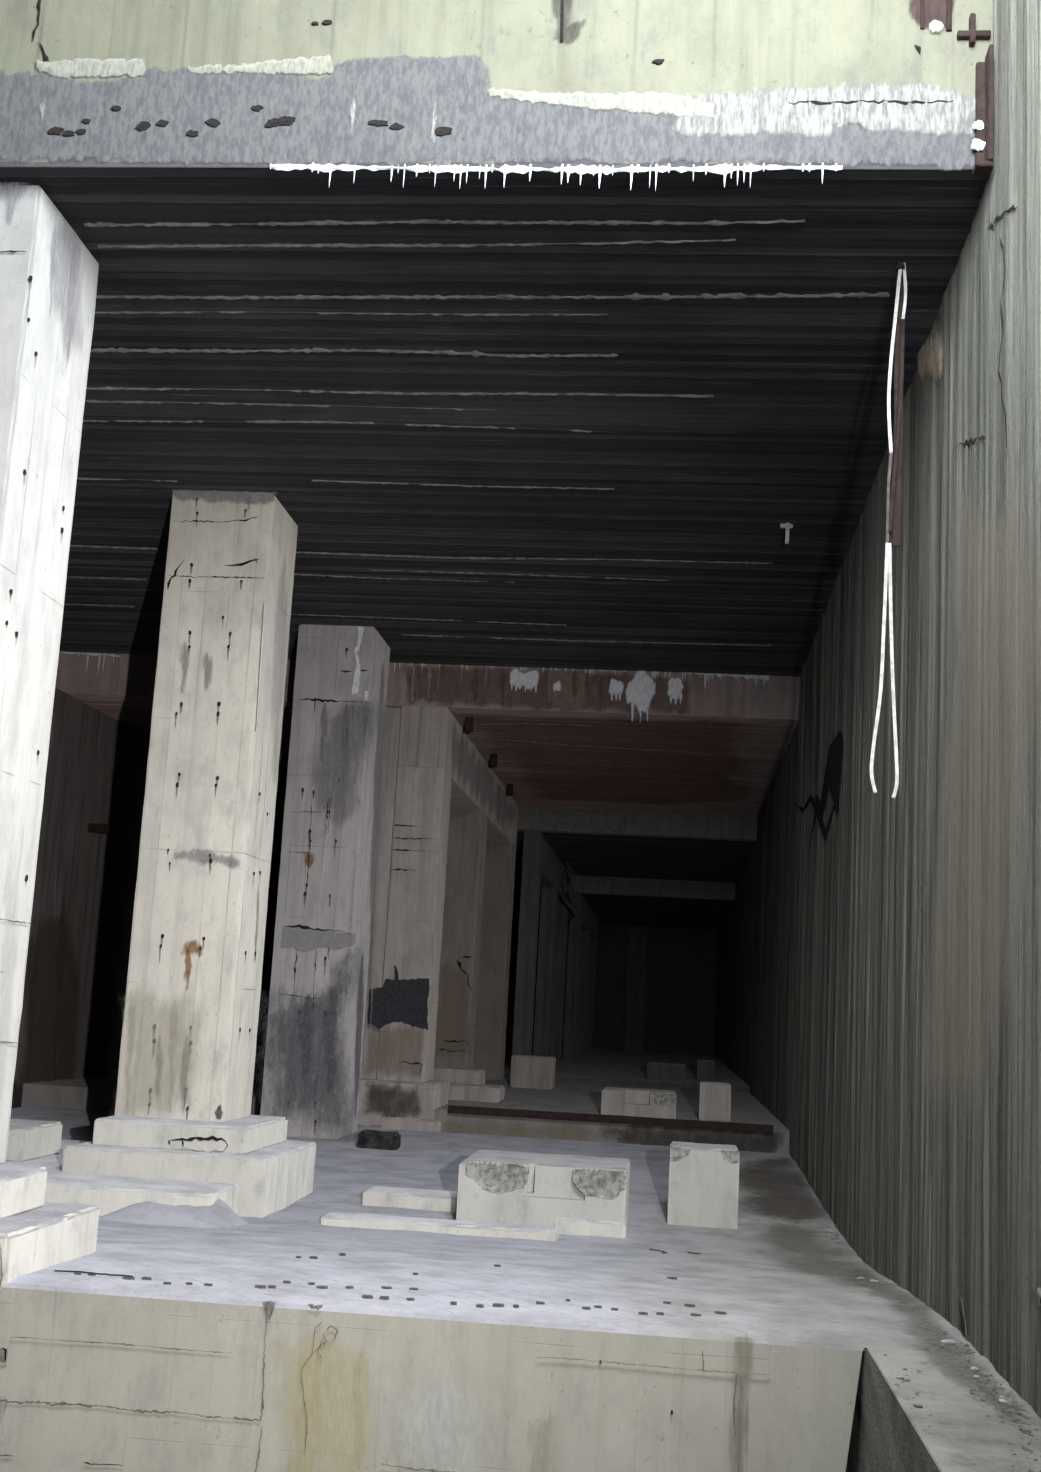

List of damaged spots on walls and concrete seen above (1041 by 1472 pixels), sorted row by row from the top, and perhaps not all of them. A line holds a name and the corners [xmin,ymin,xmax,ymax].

damp [929,20,943,32]
peeling [36,58,145,78]
peeling [188,55,333,74]
peeling [489,87,714,119]
damp [0,54,985,191]
damp [0,182,24,219]
damp [249,596,771,1134]
rust [185,941,202,982]
peeling [368,965,430,1030]
crack [168,1136,228,1153]
crack [55,1269,133,1277]
crack [0,1321,267,1472]